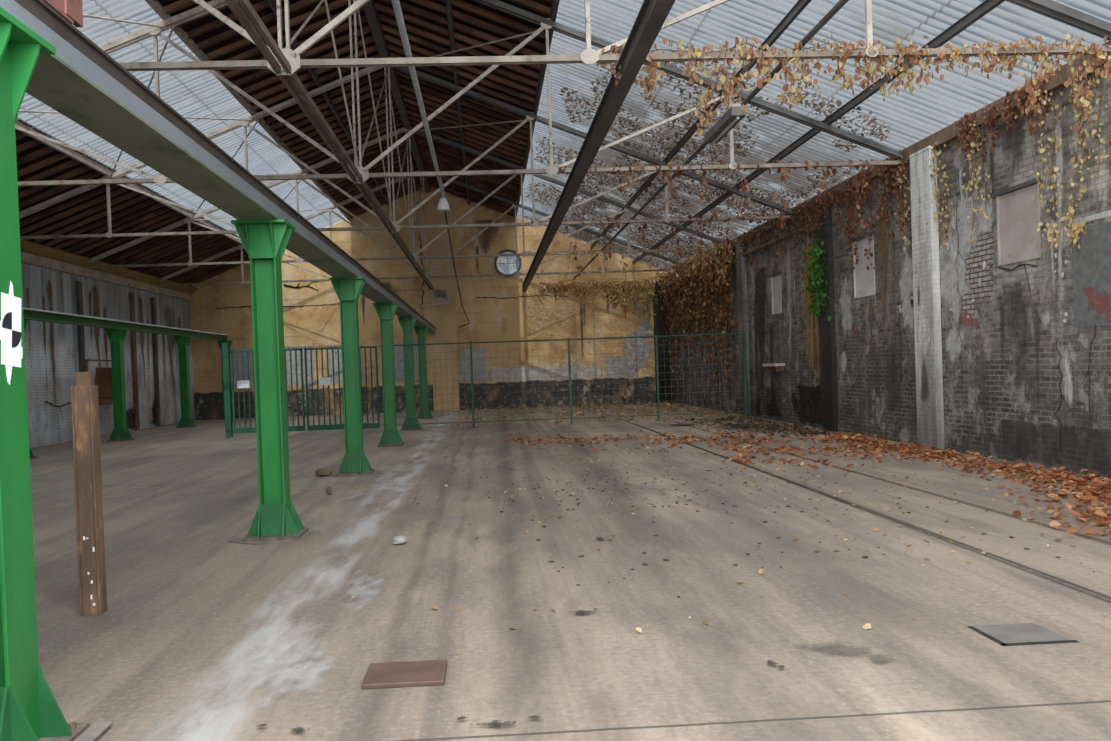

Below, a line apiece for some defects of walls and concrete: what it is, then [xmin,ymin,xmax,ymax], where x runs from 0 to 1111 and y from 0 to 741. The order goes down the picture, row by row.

peeling [839,274,853,337]
peeling [899,240,930,400]
peeling [939,188,997,362]